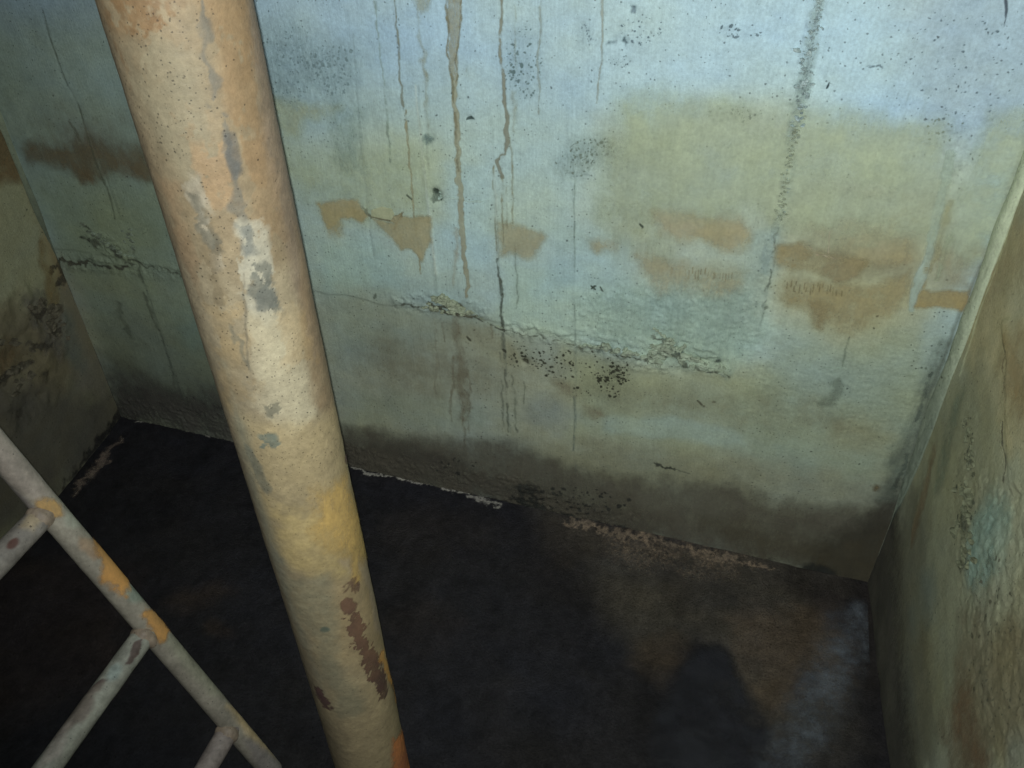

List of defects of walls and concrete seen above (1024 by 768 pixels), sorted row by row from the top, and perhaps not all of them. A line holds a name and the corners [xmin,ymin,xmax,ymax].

rust [445,0,470,297]
crack [58,254,178,274]
leakage [497,270,506,375]
rust [318,481,396,702]
leakage [342,428,913,768]